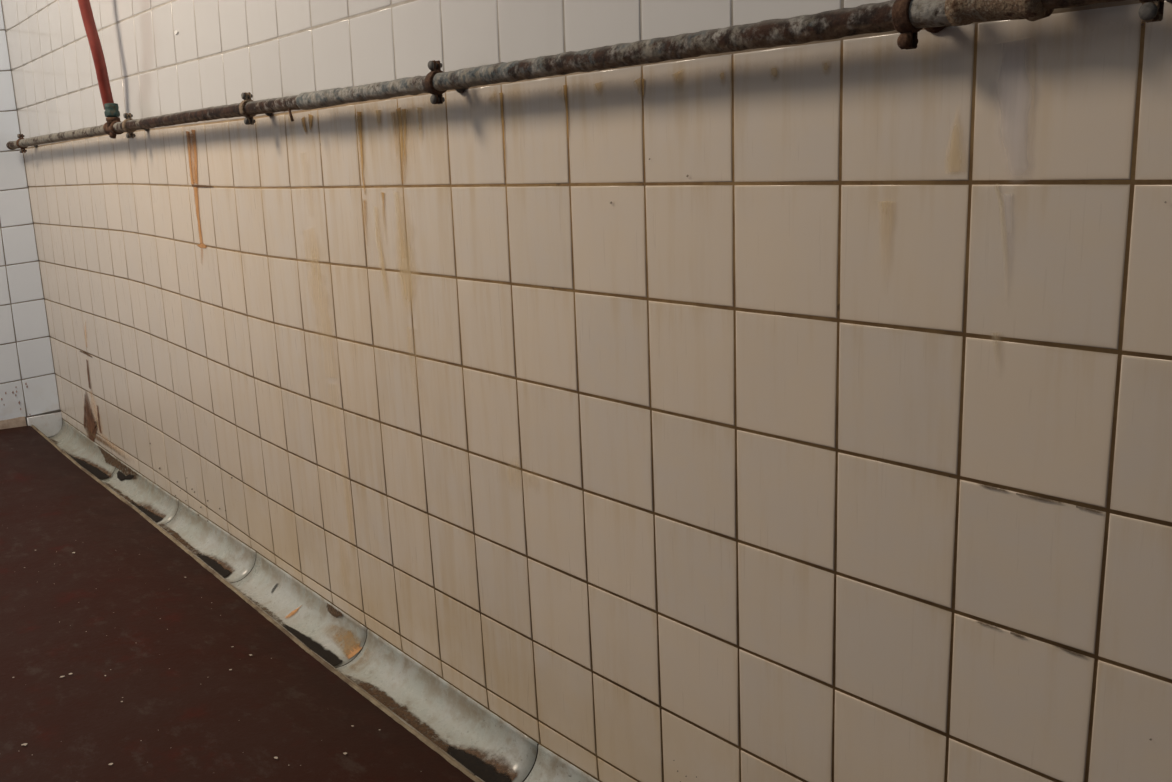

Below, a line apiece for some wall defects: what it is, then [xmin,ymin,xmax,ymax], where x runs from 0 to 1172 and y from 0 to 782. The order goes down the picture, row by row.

corrosion [186,130,213,248]
corrosion [80,351,115,450]